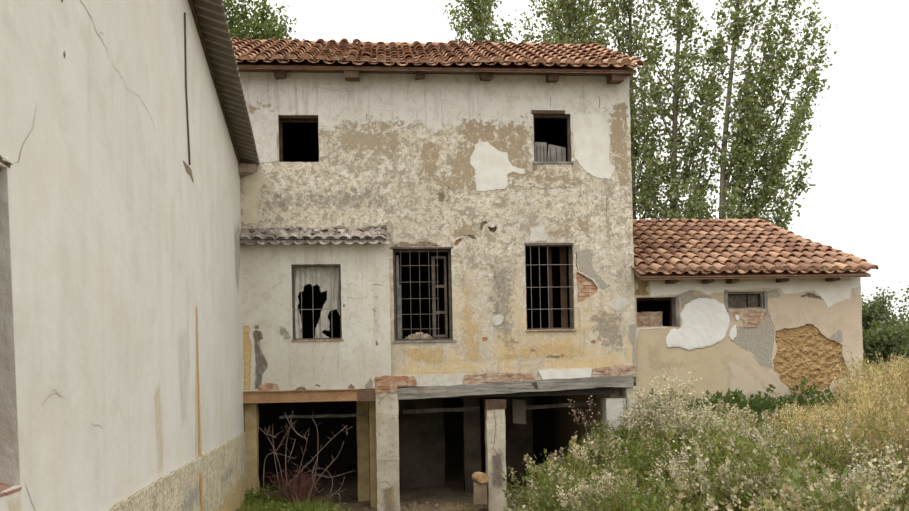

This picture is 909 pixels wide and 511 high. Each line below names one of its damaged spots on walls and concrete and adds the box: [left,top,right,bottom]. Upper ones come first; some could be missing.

crack [81,1,152,119]
peeling [328,111,410,165]
peeling [419,114,584,204]
peeling [608,102,631,187]
peeling [453,219,496,246]
peeling [547,216,589,240]
peeling [576,249,610,302]
peeling [649,277,861,308]
flaking render [592,324,637,377]
peeling [728,309,775,368]
flaking render [348,375,417,393]
flaking render [463,372,535,384]